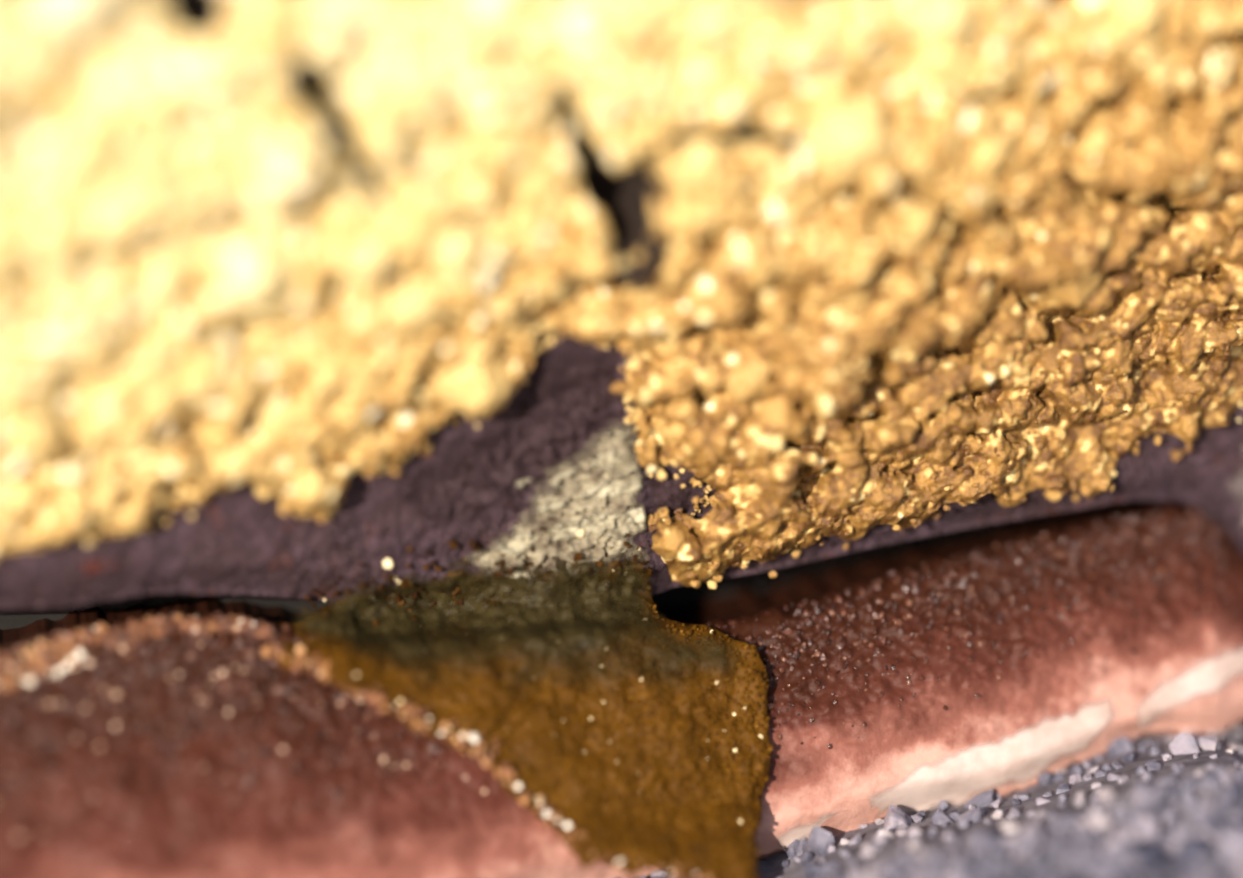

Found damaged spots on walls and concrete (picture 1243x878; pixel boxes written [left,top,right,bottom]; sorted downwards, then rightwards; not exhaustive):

crack [284,40,394,209]
crack [553,83,799,289]